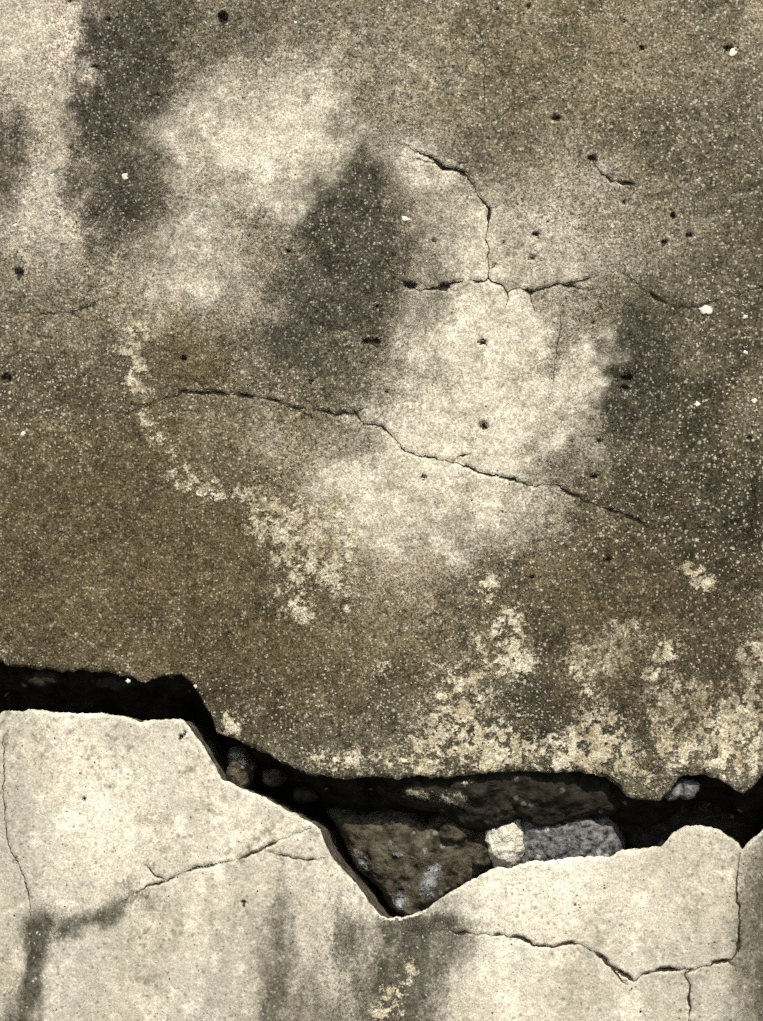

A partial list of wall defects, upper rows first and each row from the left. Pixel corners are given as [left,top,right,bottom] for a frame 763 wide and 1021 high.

damp [0,0,683,576]
crack [390,144,598,381]
crack [592,159,643,186]
crack [623,273,763,308]
crack [117,380,746,549]
damp [5,900,125,1021]
crack [0,661,450,915]
spalling [179,711,403,919]
crack [536,770,556,778]
crack [426,774,763,1021]